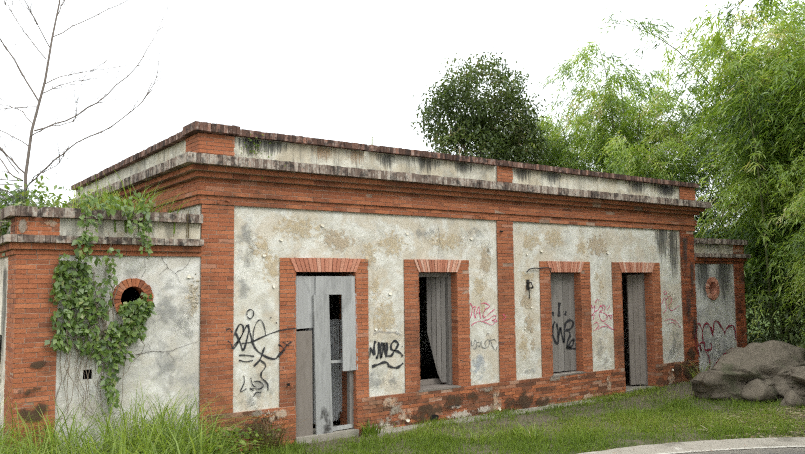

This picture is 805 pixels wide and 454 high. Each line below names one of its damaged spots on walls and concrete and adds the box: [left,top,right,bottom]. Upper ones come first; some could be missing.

leakage [239,138,287,154]
leakage [657,184,674,196]
flaking render [376,398,411,430]